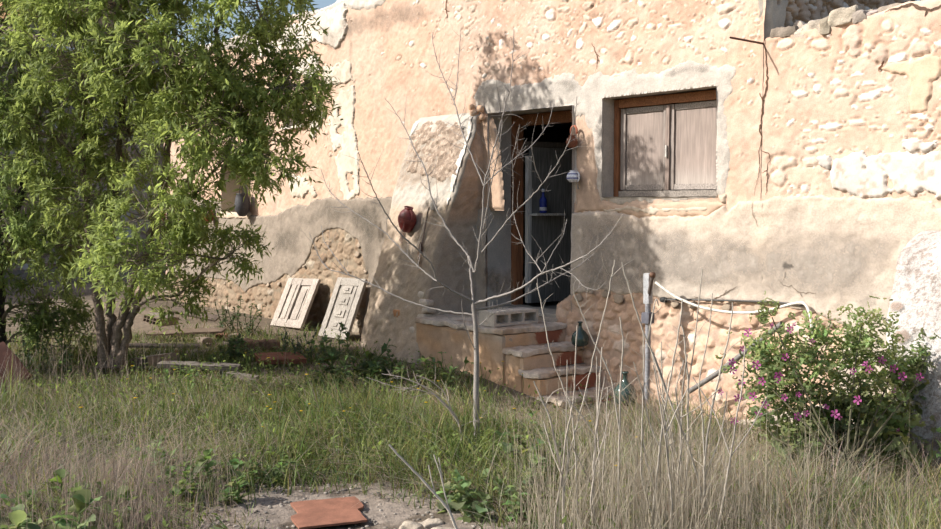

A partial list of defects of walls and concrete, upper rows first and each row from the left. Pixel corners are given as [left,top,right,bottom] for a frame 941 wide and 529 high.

crack [884,3,941,26]
flaking render [252,3,360,201]
spalling [406,104,485,210]
crack [752,44,770,227]
flaking render [816,138,941,199]
spalling [135,228,370,335]